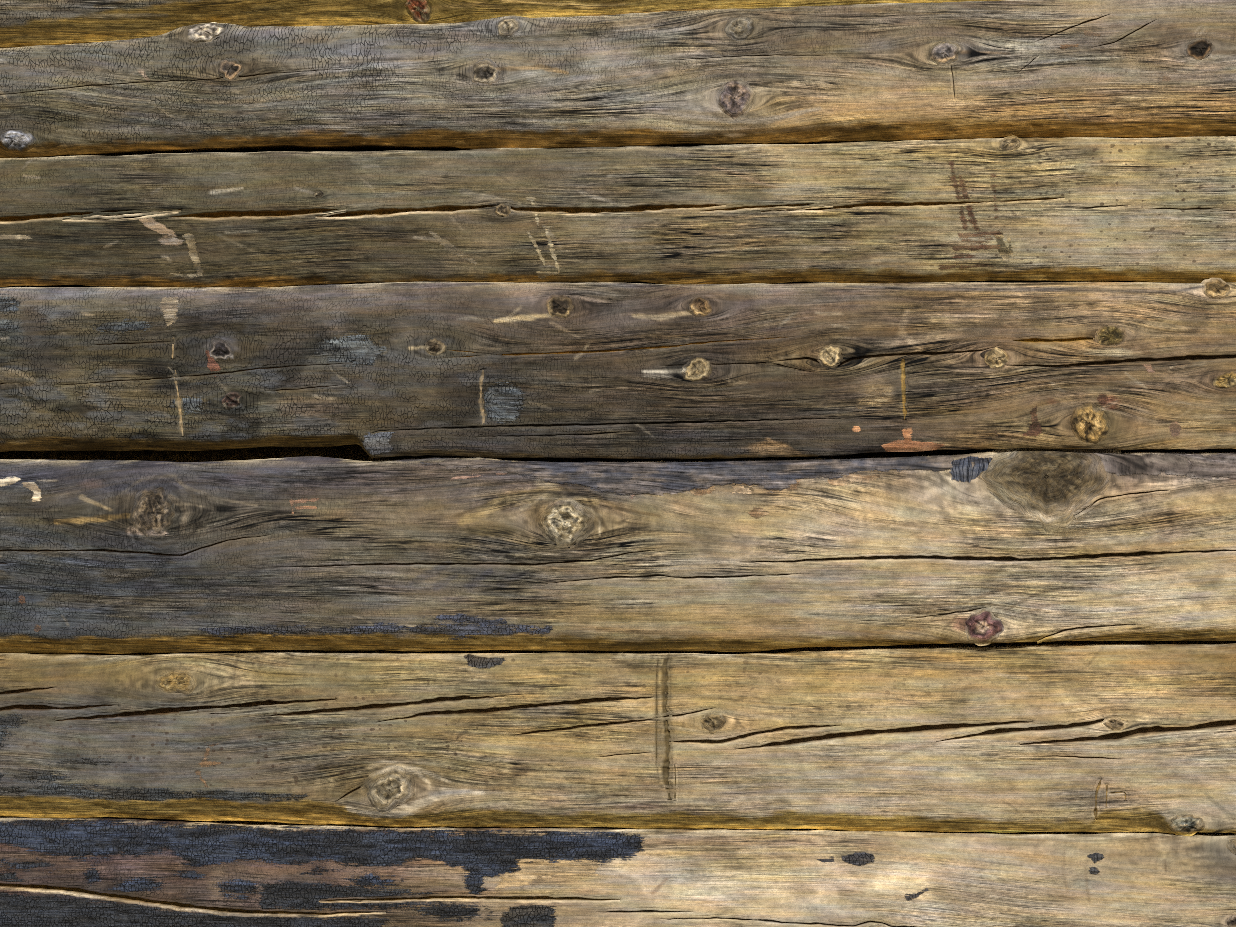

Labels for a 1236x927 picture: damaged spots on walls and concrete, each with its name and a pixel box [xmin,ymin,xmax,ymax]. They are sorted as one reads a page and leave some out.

rust [881,427,944,452]
crack [0,685,1236,761]
peeling [495,853,599,890]